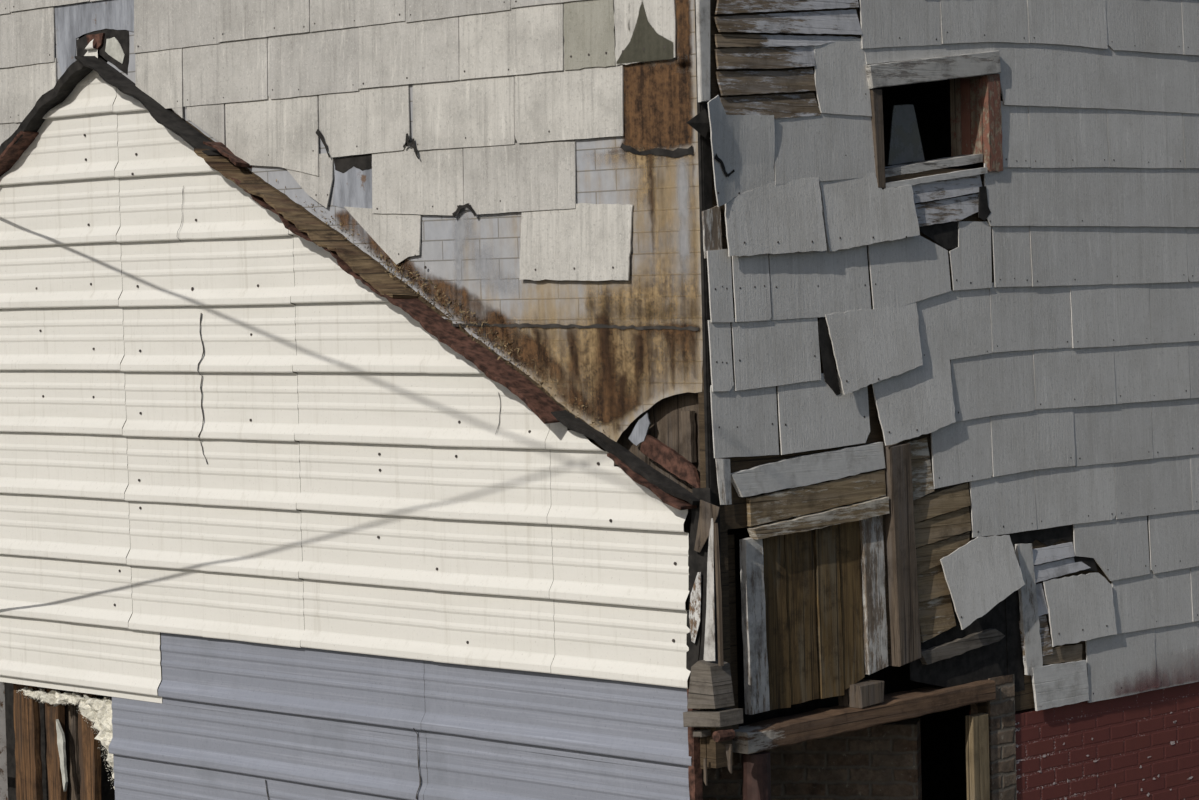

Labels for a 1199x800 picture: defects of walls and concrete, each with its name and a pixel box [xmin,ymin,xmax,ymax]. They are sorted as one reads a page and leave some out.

damp [616,2,673,64]
peeling [714,0,862,119]
corrosion [203,141,697,429]
peeling [904,437,972,642]
peeling [1005,525,1098,680]